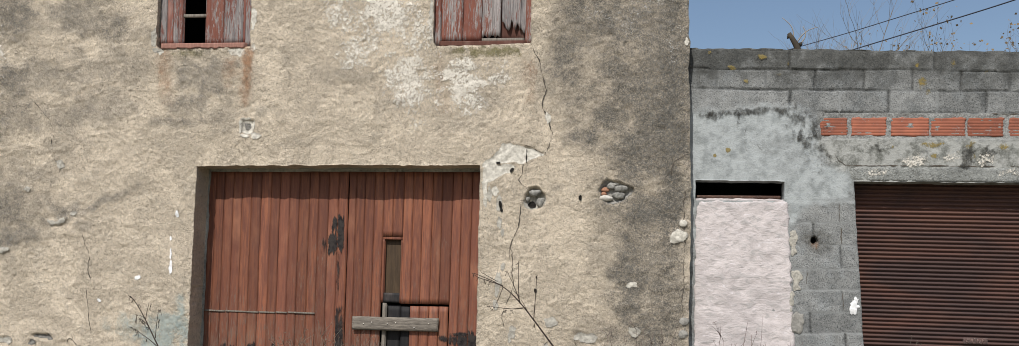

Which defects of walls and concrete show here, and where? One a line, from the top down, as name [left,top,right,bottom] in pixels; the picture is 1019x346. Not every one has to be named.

damp [323,0,510,129]
spalling [481,143,546,237]
crack [518,46,553,183]
damp [559,0,691,320]
damp [708,103,830,157]
crack [502,207,521,326]